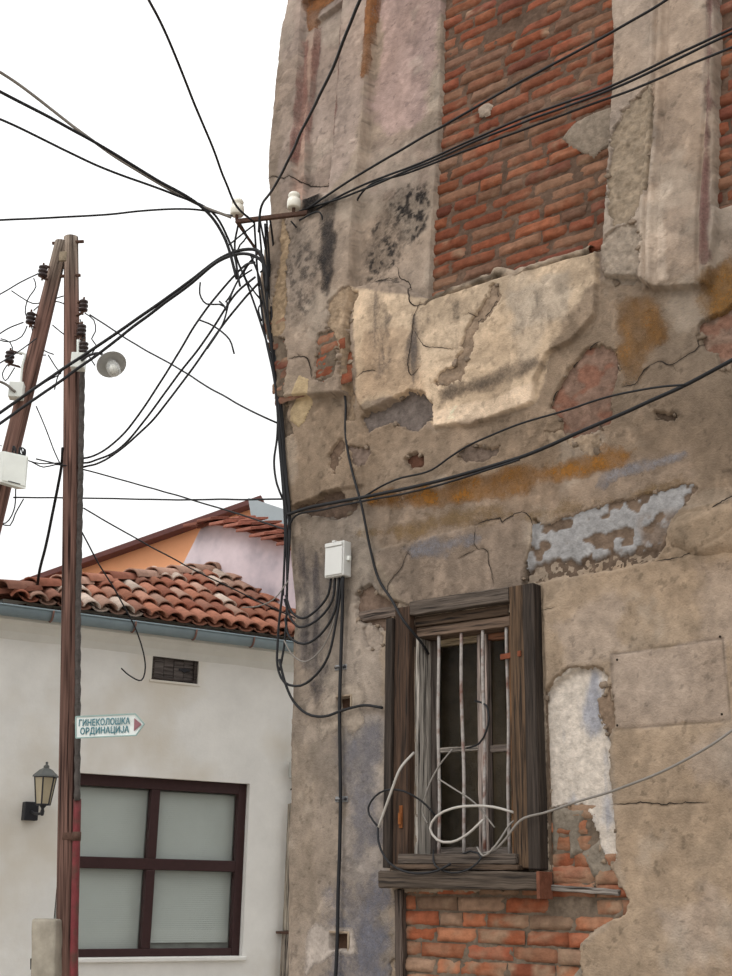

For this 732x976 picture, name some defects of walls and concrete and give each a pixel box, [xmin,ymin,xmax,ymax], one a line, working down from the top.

flaking render [314,286,433,433]
crack [375,267,451,375]
flaking render [544,345,621,457]
flaking render [330,440,345,474]
flaking render [406,453,424,468]
crack [461,511,533,580]
peeling [522,484,698,582]
flaking render [390,667,629,976]